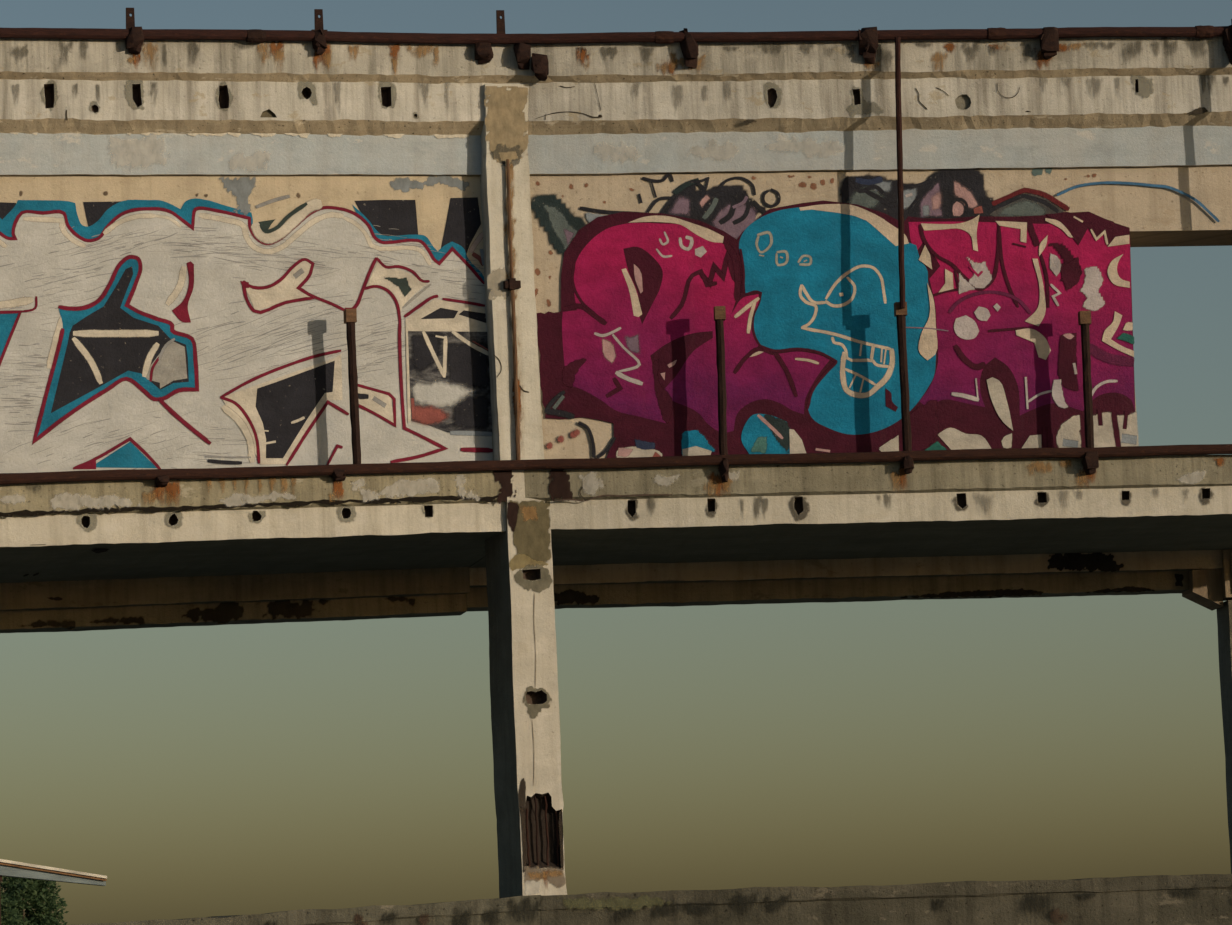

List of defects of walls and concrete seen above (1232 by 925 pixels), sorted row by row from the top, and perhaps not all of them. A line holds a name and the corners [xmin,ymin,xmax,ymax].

rust [257,41,284,61]
rust [504,165,517,299]
spalling [507,500,553,593]
spalling [523,686,552,719]
spalling [518,778,566,888]